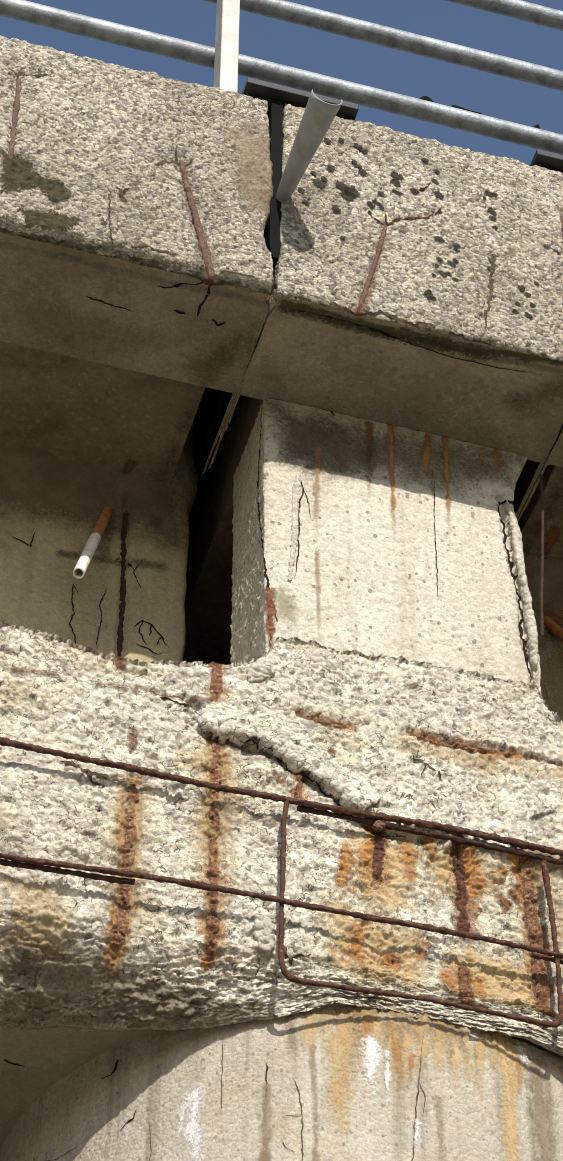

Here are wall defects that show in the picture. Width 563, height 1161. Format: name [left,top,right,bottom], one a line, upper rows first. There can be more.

crack [34,187,260,326]
water stain [268,404,511,490]
crack [257,398,500,643]
crack [498,500,548,697]
rust [129,727,137,752]
peeling [246,657,276,683]
peeling [0,662,563,1028]
rust [328,820,558,1017]
water stain [175,1084,204,1161]
water stain [259,1082,272,1161]
crack [265,1063,304,1161]
rust [300,1006,553,1161]